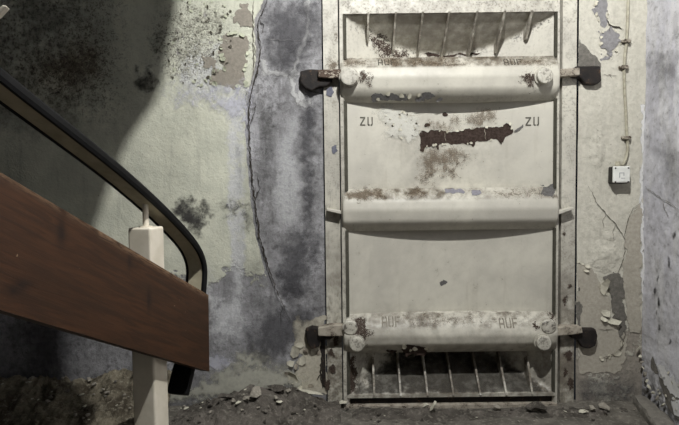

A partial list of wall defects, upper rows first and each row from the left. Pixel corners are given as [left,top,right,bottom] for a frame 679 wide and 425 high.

peeling [164,0,253,90]
peeling [578,0,622,67]
damp [261,0,314,182]
damp [173,198,213,234]
crack [245,2,290,319]
damp [278,239,310,296]
rust [347,187,387,200]
rust [407,148,466,198]
peeling [575,162,644,374]
crack [588,186,640,272]
peeling [284,315,328,395]
rust [351,317,374,348]